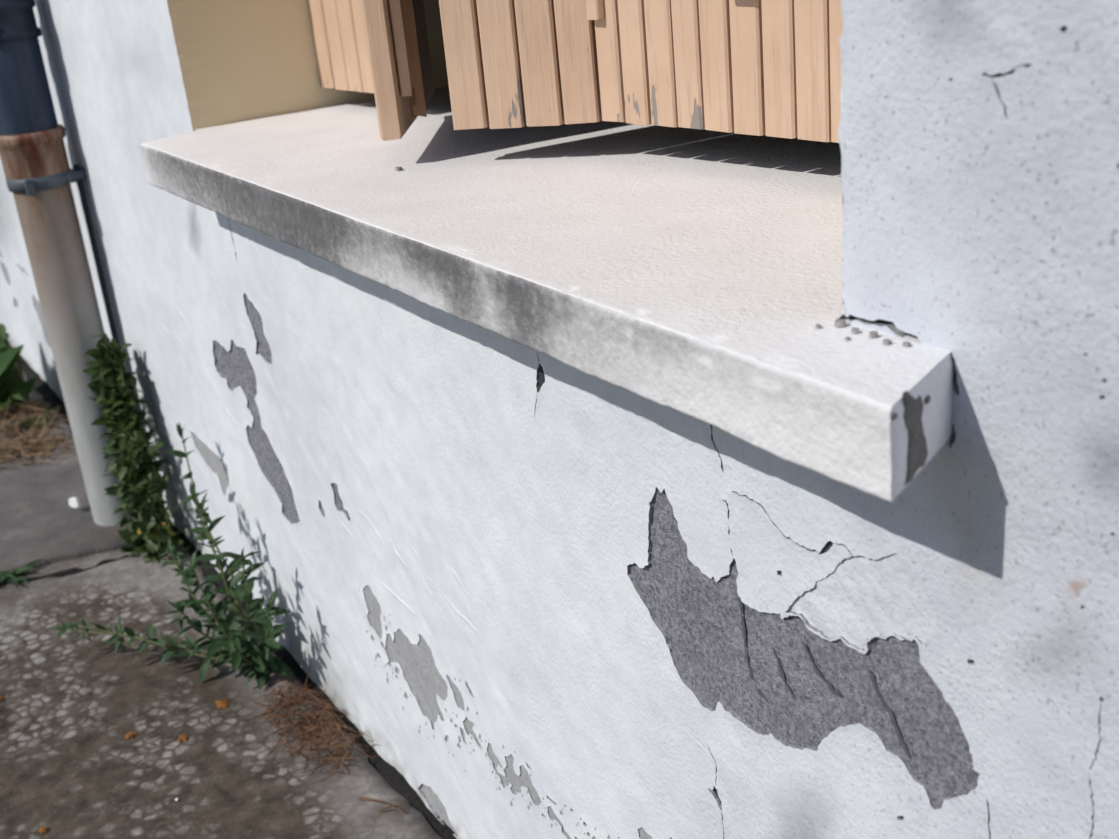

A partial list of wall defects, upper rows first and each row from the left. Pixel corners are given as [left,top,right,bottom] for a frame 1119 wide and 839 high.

peeling [191,432,229,496]
spalling [213,293,300,524]
crack [710,424,853,556]
spalling [891,391,931,485]
peeling [363,585,610,839]
spalling [627,487,980,811]